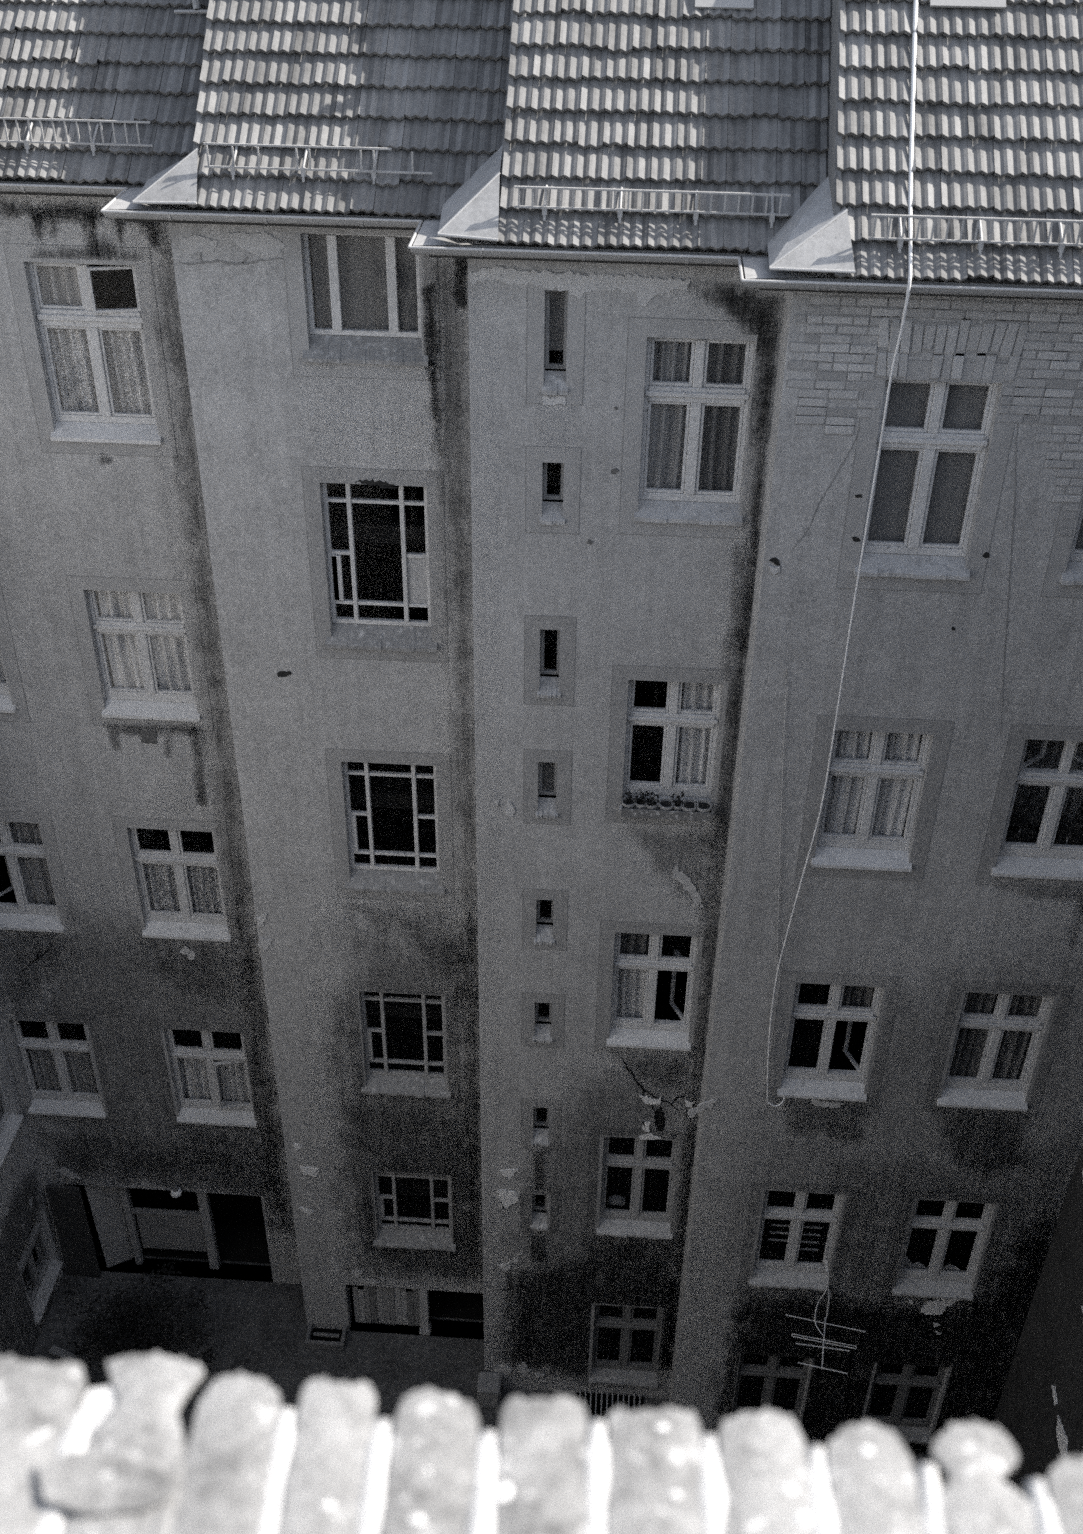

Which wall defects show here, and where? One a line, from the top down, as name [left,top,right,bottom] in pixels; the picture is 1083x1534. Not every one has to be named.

water stain [2,203,161,258]
water stain [423,258,468,453]
water stain [666,285,780,1365]
peeling [1051,1385,1068,1458]